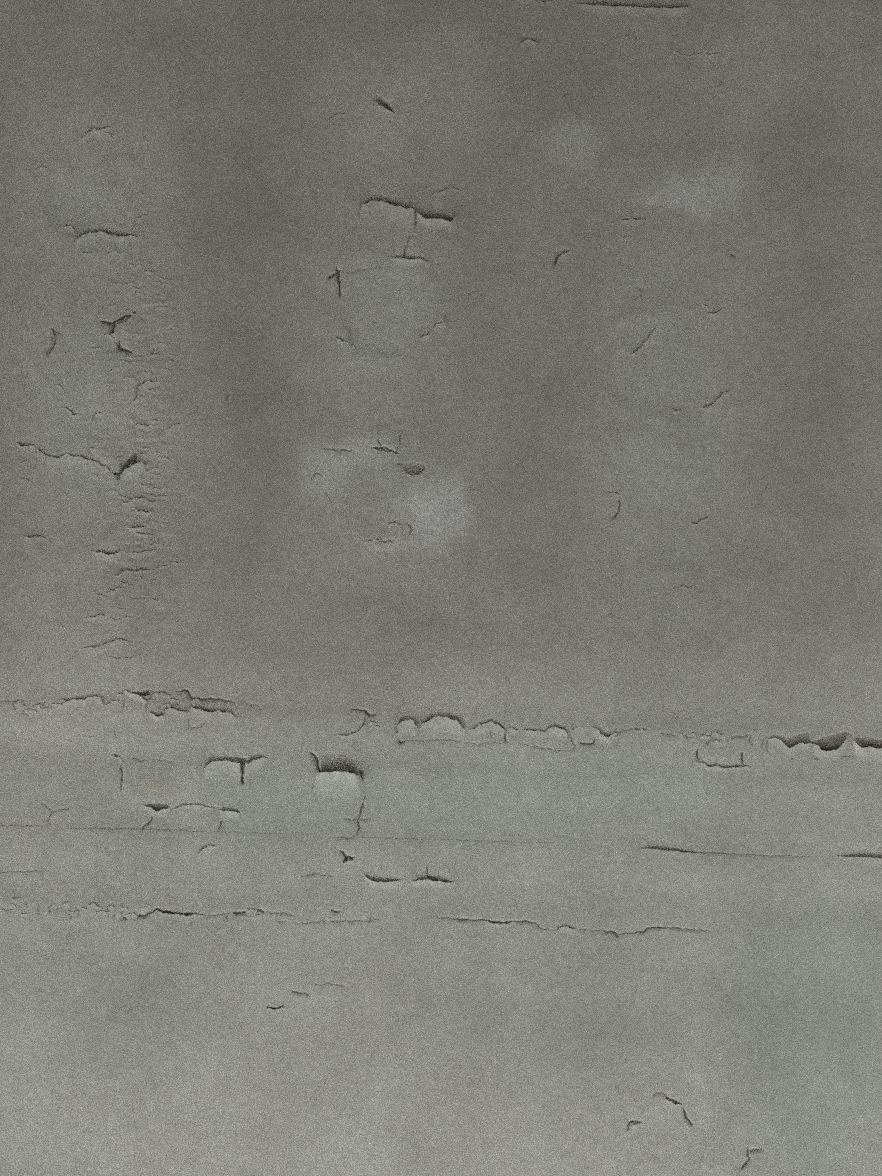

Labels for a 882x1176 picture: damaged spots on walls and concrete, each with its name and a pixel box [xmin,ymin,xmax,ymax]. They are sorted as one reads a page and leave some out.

peeling [575,3,693,18]
peeling [351,201,456,273]
crack [103,311,136,353]
crack [15,443,117,484]
peeling [2,689,260,729]
peeling [396,716,645,754]
peeling [749,730,882,763]
peeling [204,757,268,783]
crack [51,903,381,925]
crack [449,918,708,937]
crack [654,1092,692,1126]
crack [627,1121,642,1135]